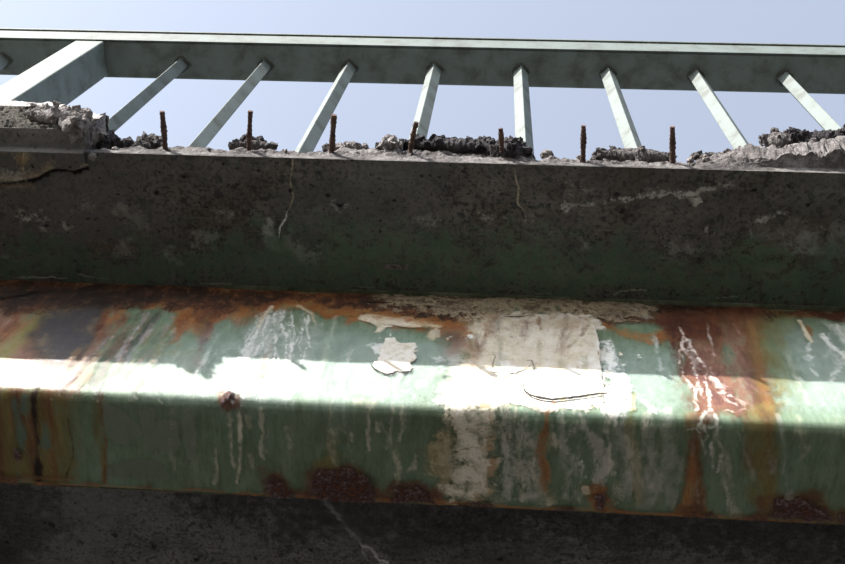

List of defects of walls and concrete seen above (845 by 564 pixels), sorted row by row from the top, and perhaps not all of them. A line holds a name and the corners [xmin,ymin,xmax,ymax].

crack [0,152,89,192]
crack [275,159,294,245]
spalling [84,110,845,173]
corrosion [0,280,487,497]
water stain [20,303,845,564]
peeling [295,303,628,415]
corrosion [373,303,845,525]
crack [313,499,395,564]